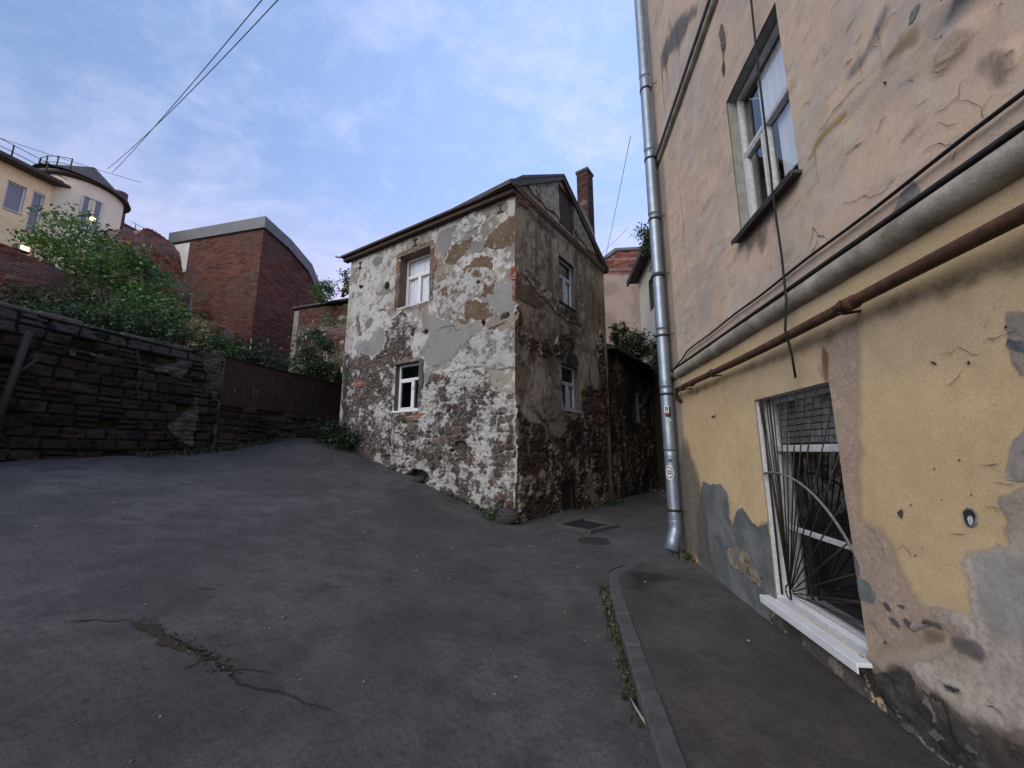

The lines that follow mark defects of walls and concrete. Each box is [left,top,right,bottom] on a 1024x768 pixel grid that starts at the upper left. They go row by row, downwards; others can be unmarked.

crack [800,5,903,131]
crack [900,32,993,162]
spalling [341,182,610,523]
peeling [770,324,1024,768]